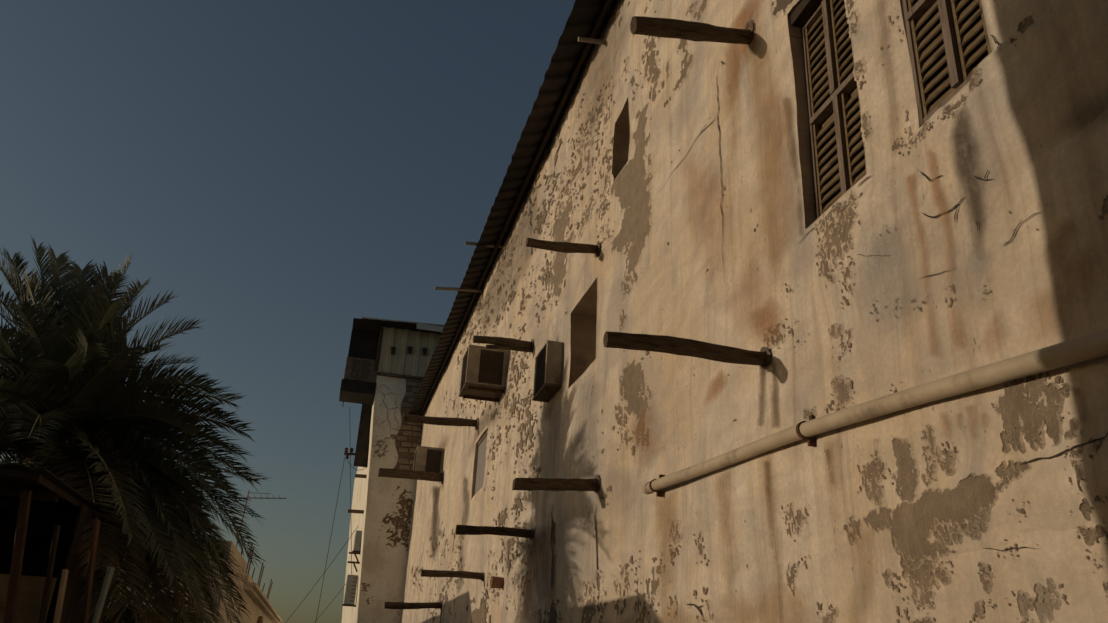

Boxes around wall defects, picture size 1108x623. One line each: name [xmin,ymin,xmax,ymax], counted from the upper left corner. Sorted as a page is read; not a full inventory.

peeling [770,0,799,20]
crack [658,61,724,270]
crack [922,170,991,230]
peeling [815,191,862,309]
peeling [410,34,715,623]
peeling [803,323,855,419]
peeling [380,483,413,551]
peeling [843,368,1108,623]
crack [1019,432,1108,465]